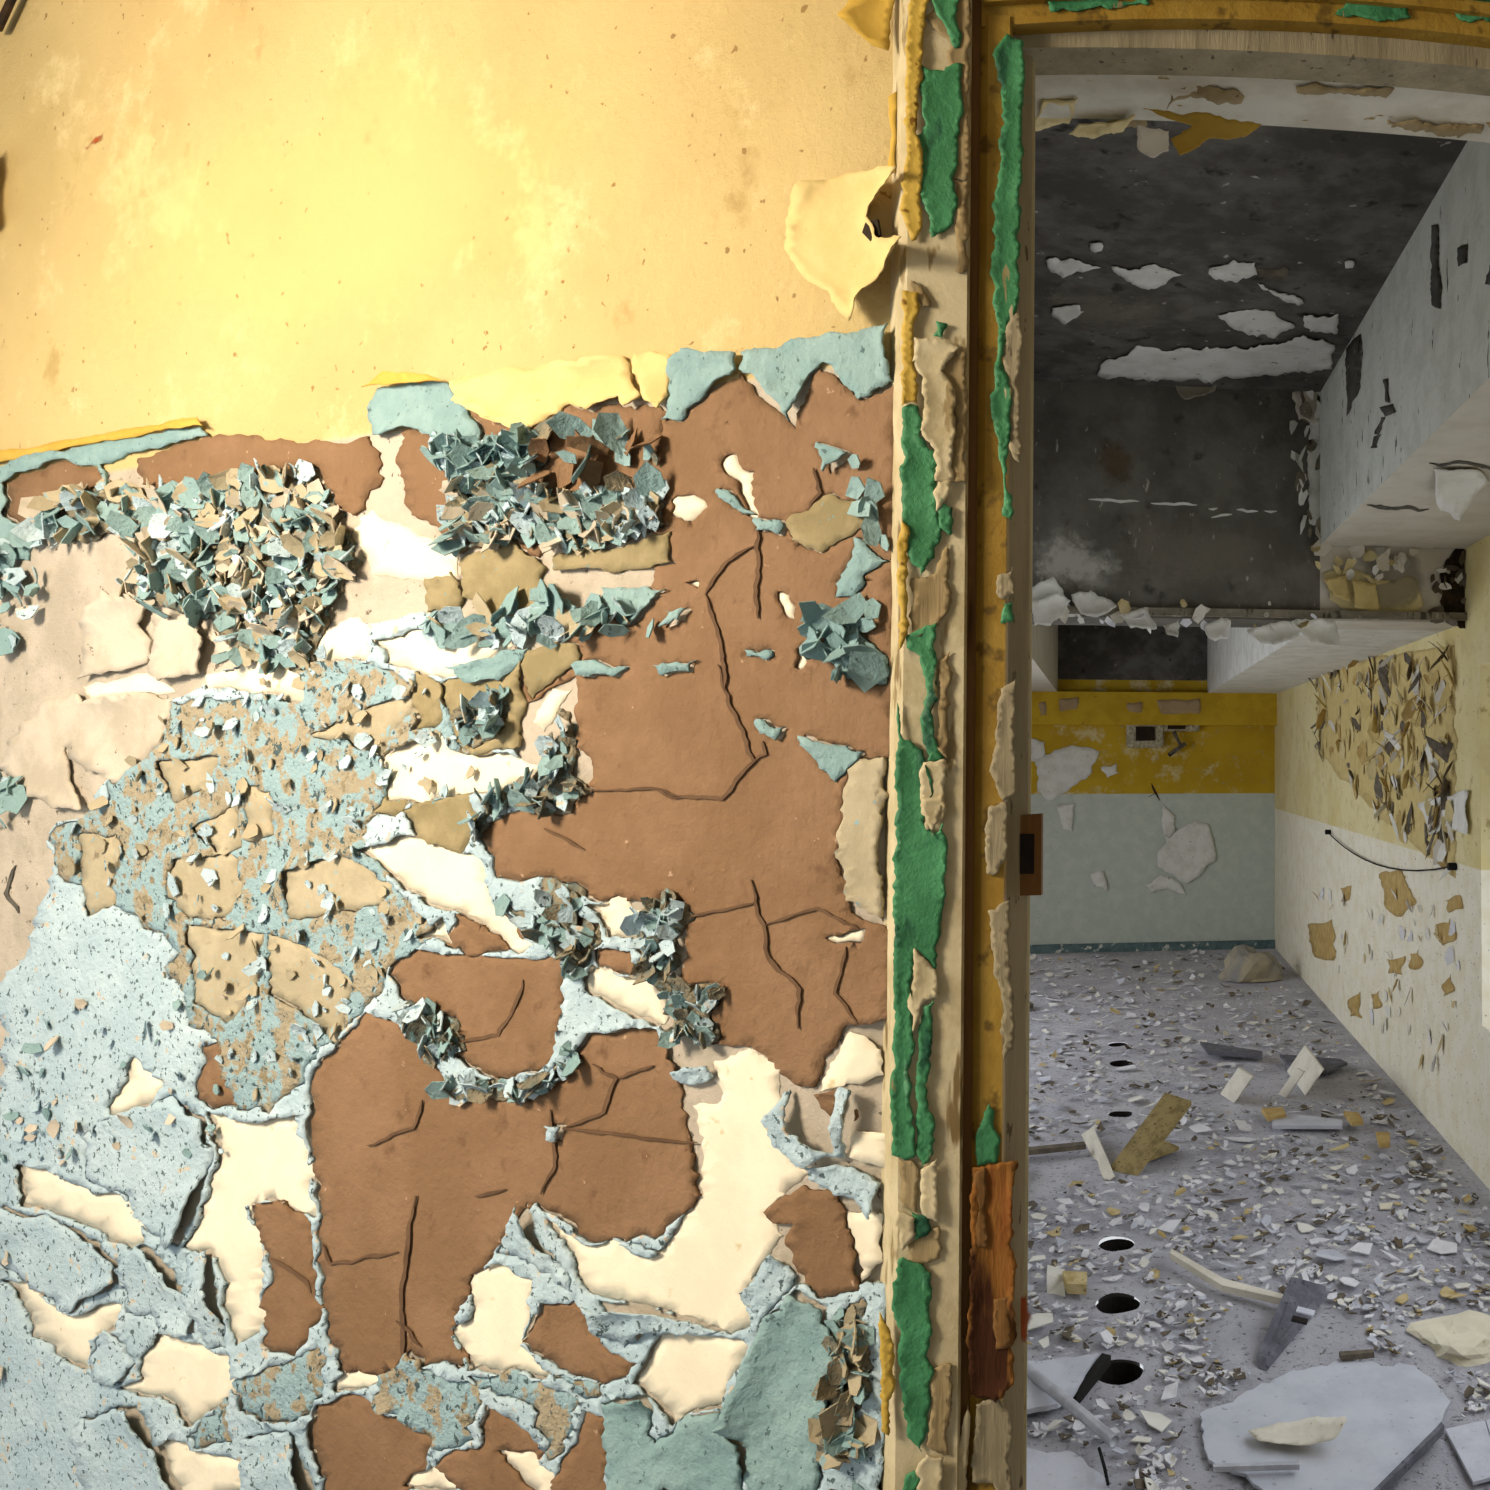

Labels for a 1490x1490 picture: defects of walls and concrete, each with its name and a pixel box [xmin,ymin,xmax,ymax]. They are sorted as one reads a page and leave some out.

peeling [990,33,1262,520]
peeling [1430,224,1442,309]
crack [806,468,822,511]
peeling [1433,469,1489,521]
crack [589,525,768,801]
peeling [984,260,1468,1072]
peeling [0,0,972,1490]
crack [460,980,524,1043]
crack [688,880,859,1029]
crack [474,1064,697,1197]
crack [270,1196,421,1359]
peeling [971,1399,1013,1490]